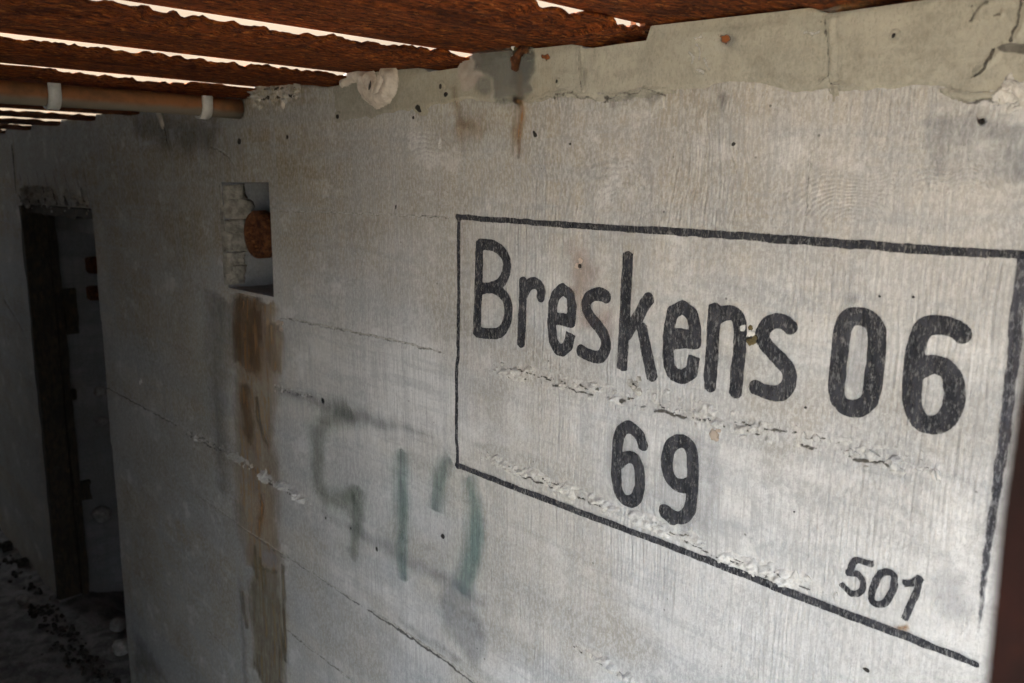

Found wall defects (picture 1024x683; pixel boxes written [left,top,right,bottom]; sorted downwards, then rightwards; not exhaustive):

water stain [473,48,534,97]
crack [940,0,1024,103]